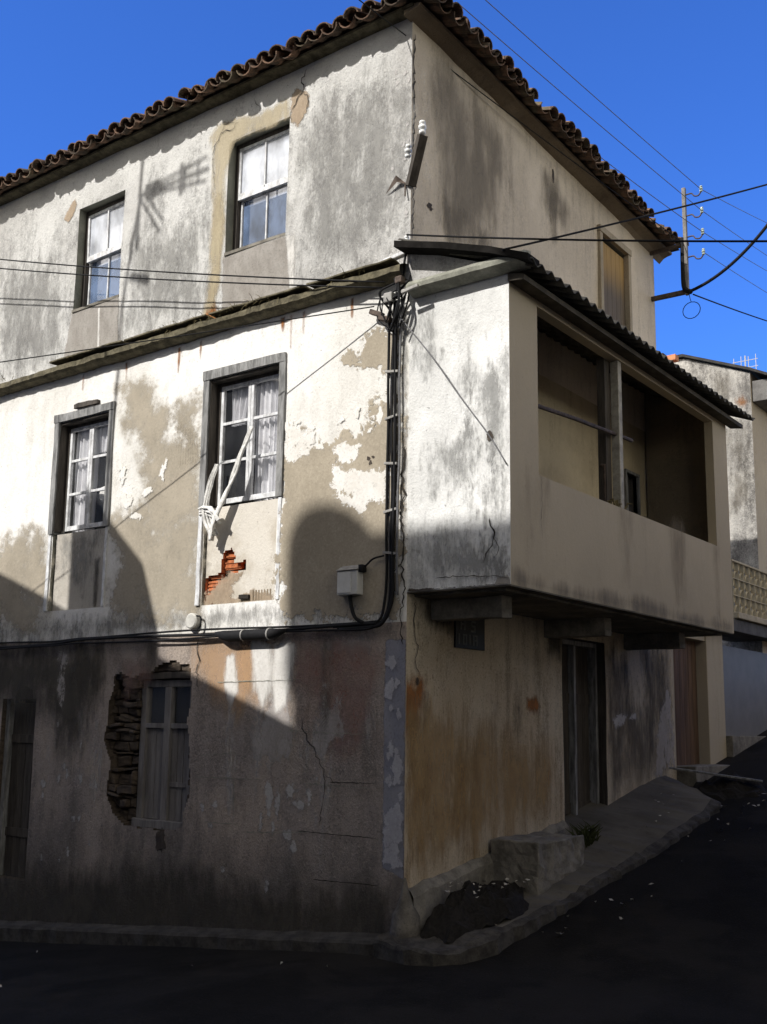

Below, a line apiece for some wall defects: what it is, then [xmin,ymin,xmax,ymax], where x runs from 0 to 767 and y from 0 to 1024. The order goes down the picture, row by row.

peeling [290,88,309,127]
damp [439,81,501,245]
damp [545,173,565,231]
crack [438,519,501,578]
peeling [109,322,510,879]
flaking render [94,660,192,825]
crack [301,722,334,822]
corrosion [406,677,423,770]
damp [0,870,388,934]